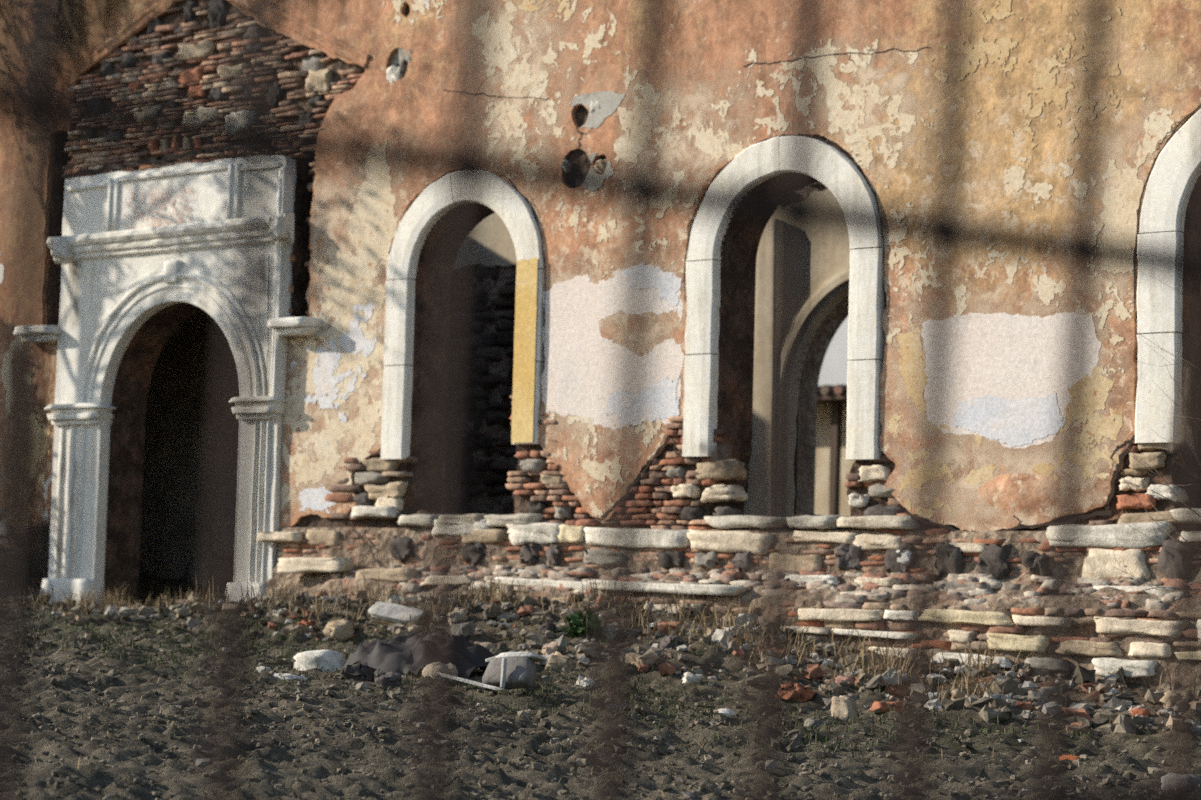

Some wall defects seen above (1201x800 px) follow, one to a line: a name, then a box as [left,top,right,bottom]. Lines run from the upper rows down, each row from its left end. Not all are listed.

spalling [68,0,250,114]
spalling [277,35,363,126]
peeling [485,0,636,169]
peeling [661,49,793,178]
crack [743,59,792,67]
crack [821,47,931,64]
peeling [819,38,941,172]
peeling [280,164,419,520]
peeling [505,196,626,527]
peeling [652,257,687,322]
peeling [947,253,1067,449]
spalling [640,339,749,530]